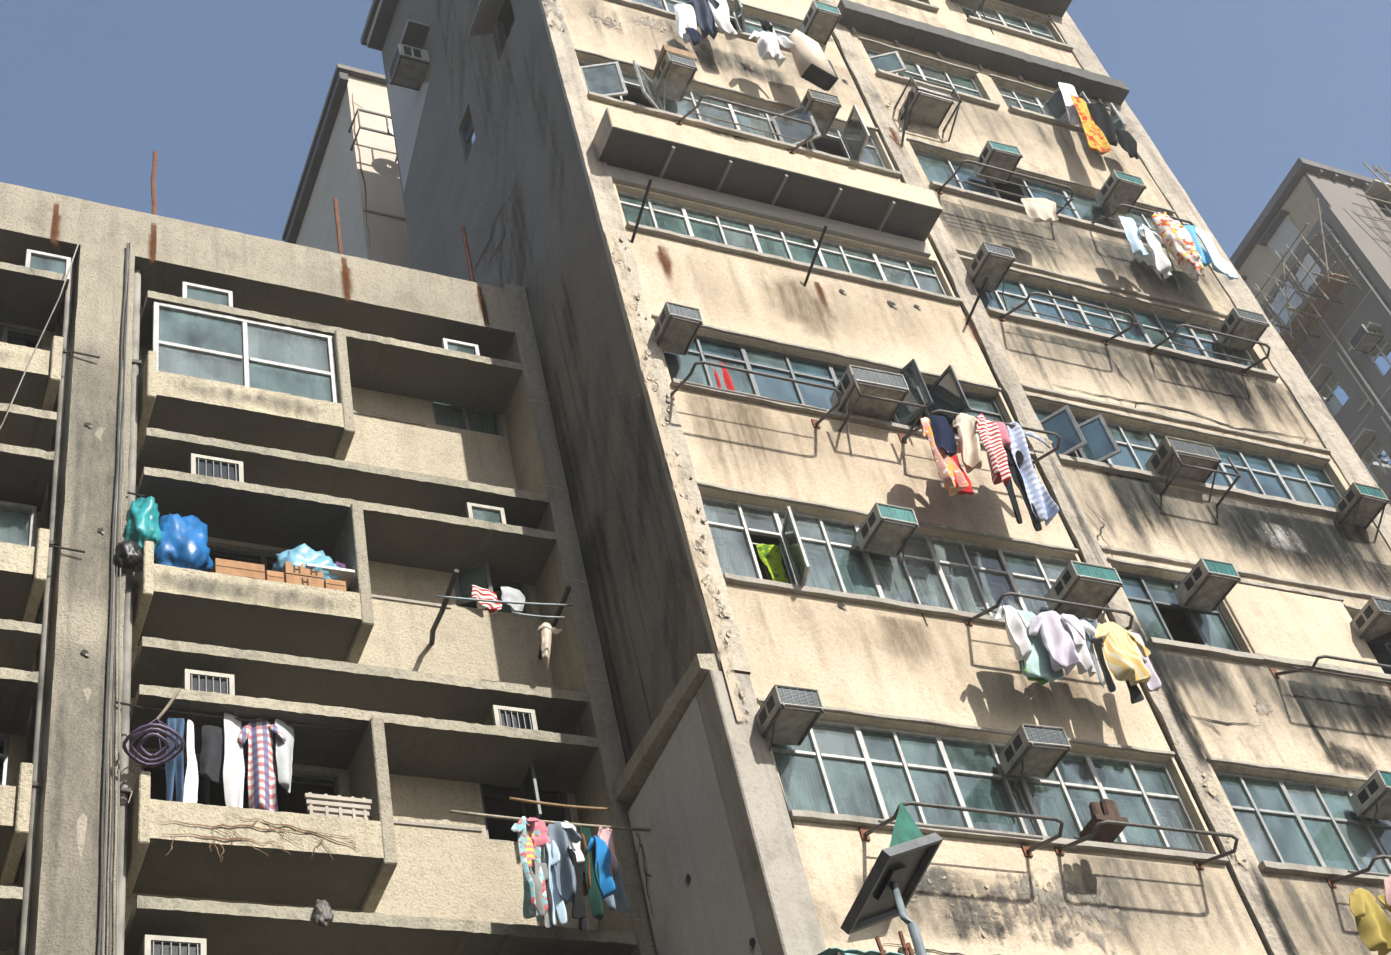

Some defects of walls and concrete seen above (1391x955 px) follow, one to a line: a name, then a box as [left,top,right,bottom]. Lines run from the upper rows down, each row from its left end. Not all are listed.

corrosion [51,204,60,242]
corrosion [342,258,351,298]
corrosion [477,286,489,325]
leakage [944,203,1033,250]
leakage [1049,223,1182,286]
leakage [1055,336,1300,423]
leakage [1102,471,1194,530]
leakage [1207,495,1391,590]
leakage [1241,663,1391,772]
leakage [927,872,972,936]
crack [885,943,1000,955]